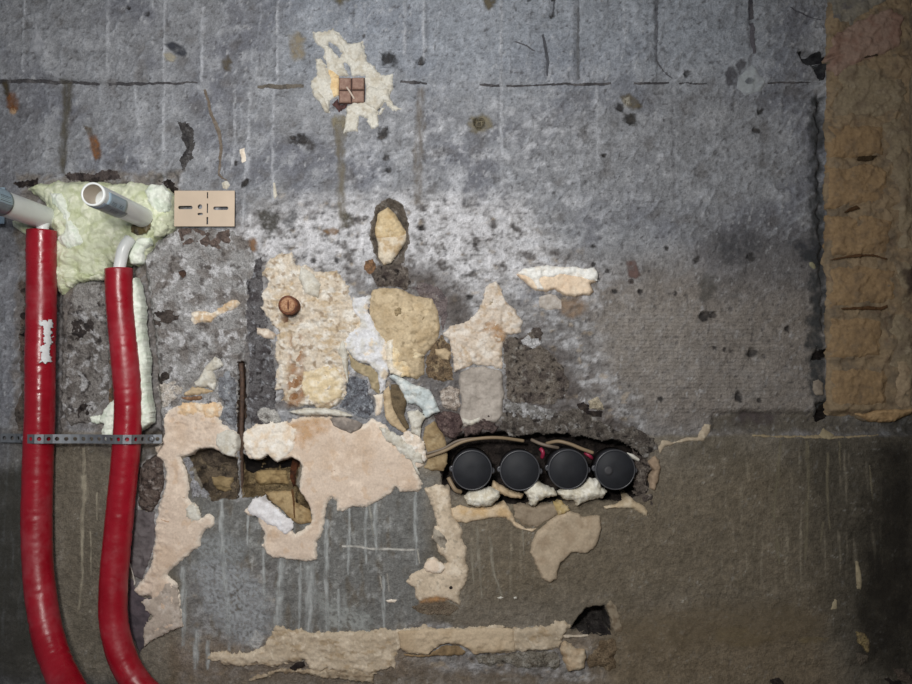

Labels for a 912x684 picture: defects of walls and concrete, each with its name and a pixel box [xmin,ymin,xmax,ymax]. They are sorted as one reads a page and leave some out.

crack [0,78,227,181]
crack [257,83,304,91]
crack [400,78,427,86]
crack [479,3,611,87]
crack [634,0,707,85]
crack [768,78,811,86]
flaking render [809,0,912,423]
spalling [145,228,281,428]
spalling [364,198,480,426]
flaking render [517,265,598,297]
spalling [183,448,312,524]
flaking render [530,489,648,583]